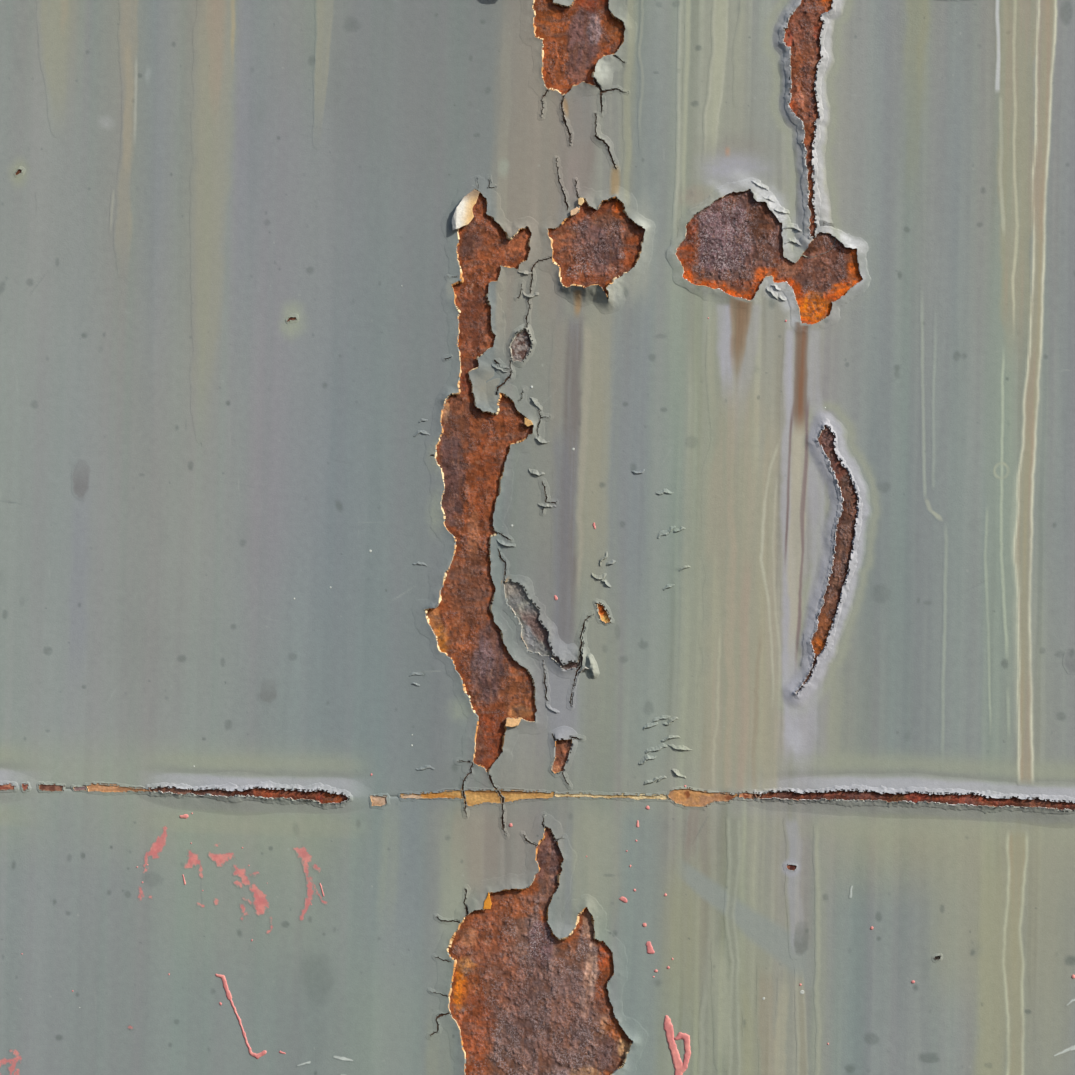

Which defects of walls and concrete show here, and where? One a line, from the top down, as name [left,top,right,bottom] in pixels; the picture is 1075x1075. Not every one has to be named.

rust [519,0,638,119]
crack [537,55,631,212]
rust [411,164,871,787]
peeling [501,574,590,679]
crack [145,780,353,810]
crack [753,784,1075,815]
rust [434,814,649,1075]